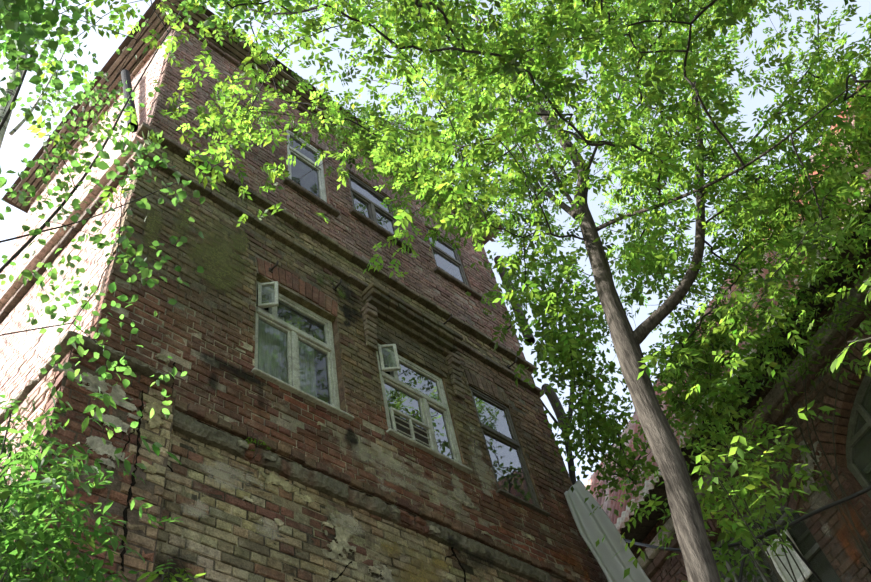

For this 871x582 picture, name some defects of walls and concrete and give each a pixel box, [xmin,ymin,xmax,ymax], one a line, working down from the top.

flaking render [39,356,166,435]
flaking render [85,436,125,470]
crack [120,390,144,572]
spalling [192,453,395,582]
crack [444,547,466,582]